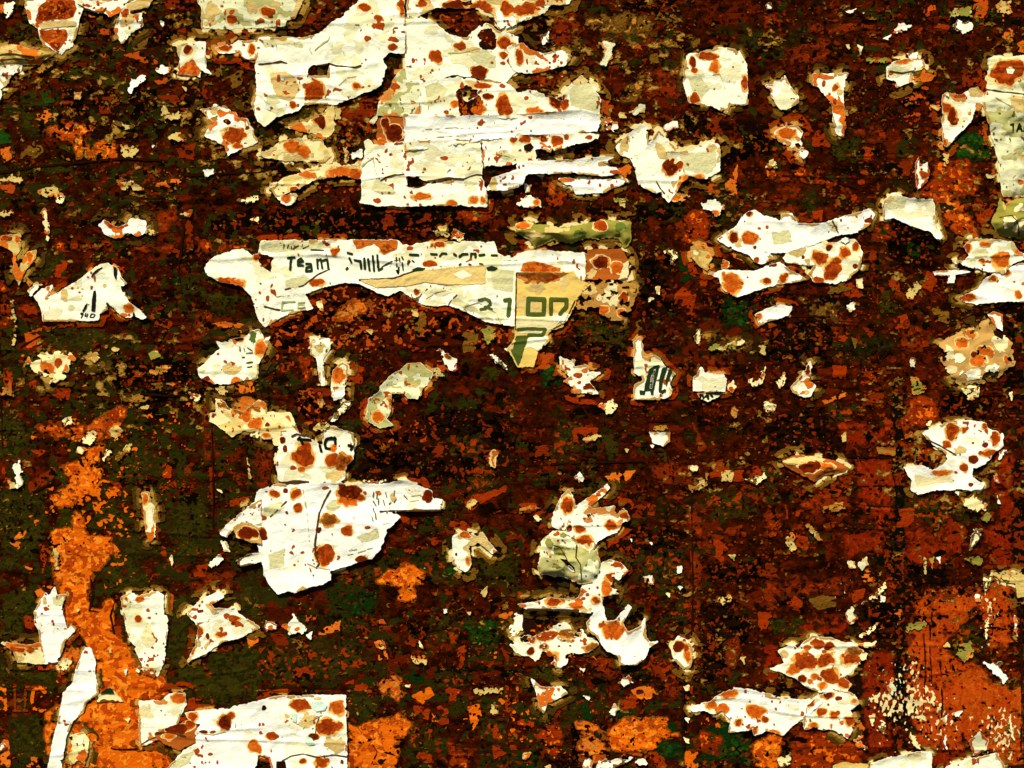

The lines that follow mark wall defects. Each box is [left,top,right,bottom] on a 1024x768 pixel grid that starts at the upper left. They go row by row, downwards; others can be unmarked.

corrosion [0,0,39,45]
peeling [932,191,995,244]
corrosion [0,10,438,610]
corrosion [216,0,1024,768]
peeling [34,404,173,768]
corrosion [88,570,131,646]
peeling [375,561,426,603]
corrosion [0,615,87,768]
corrosion [141,658,175,701]